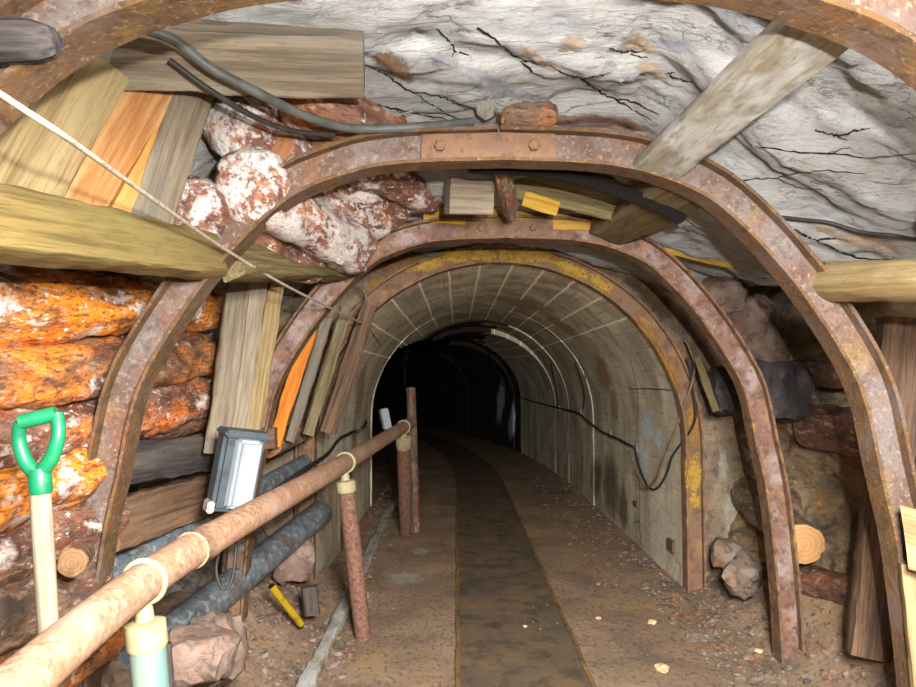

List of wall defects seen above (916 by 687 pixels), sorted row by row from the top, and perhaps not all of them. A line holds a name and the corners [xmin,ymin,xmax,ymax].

crack [436,28,472,58]
corrosion [372,51,413,81]
crack [372,67,468,120]
crack [477,27,660,121]
crack [609,48,693,83]
corrosion [557,115,649,132]
crack [743,128,916,190]
crack [794,229,893,260]
corrosion [818,225,905,252]
corrosion [361,251,421,293]
corrosion [625,277,671,317]
corrosion [685,383,700,450]